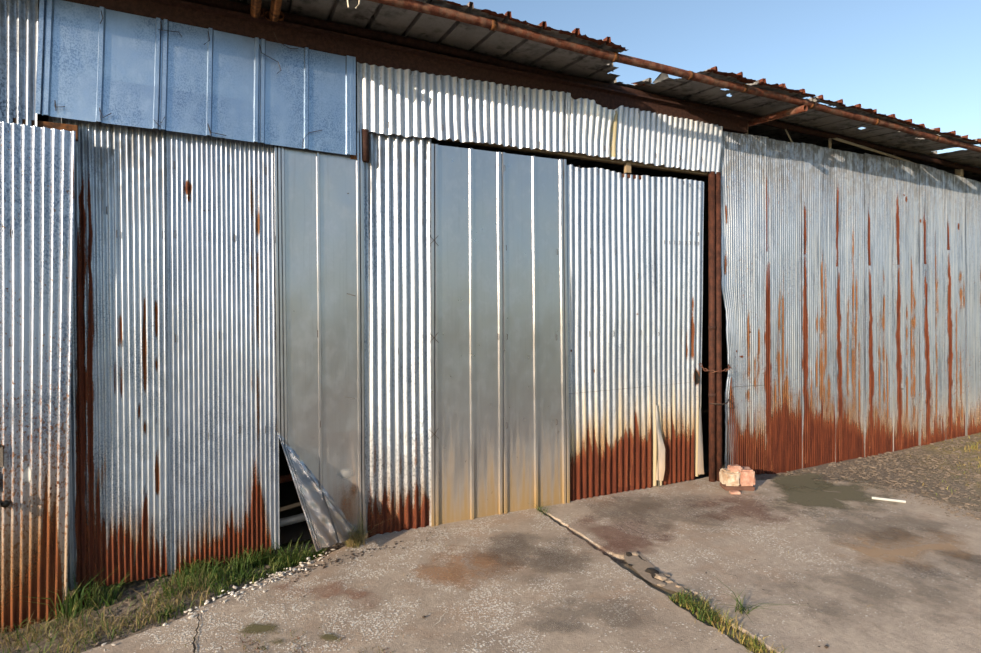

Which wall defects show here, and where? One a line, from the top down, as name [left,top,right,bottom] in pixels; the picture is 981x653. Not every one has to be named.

corrosion [0,477,62,633]
corrosion [72,155,272,605]
crack [192,613,200,653]
corrosion [367,482,430,538]
corrosion [570,410,695,501]
corrosion [727,175,981,475]